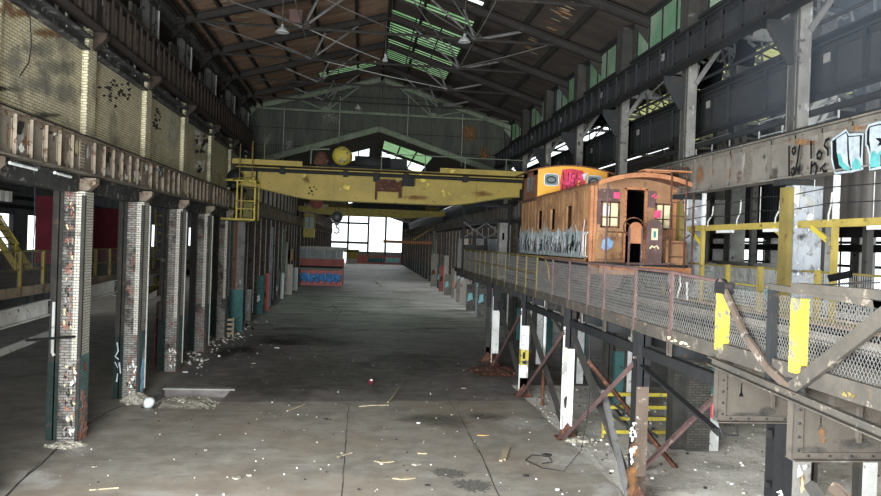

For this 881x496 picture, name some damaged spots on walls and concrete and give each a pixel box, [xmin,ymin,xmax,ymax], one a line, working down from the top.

spalling [63,195,75,329]
peeling [62,360,88,440]
crack [448,399,499,496]